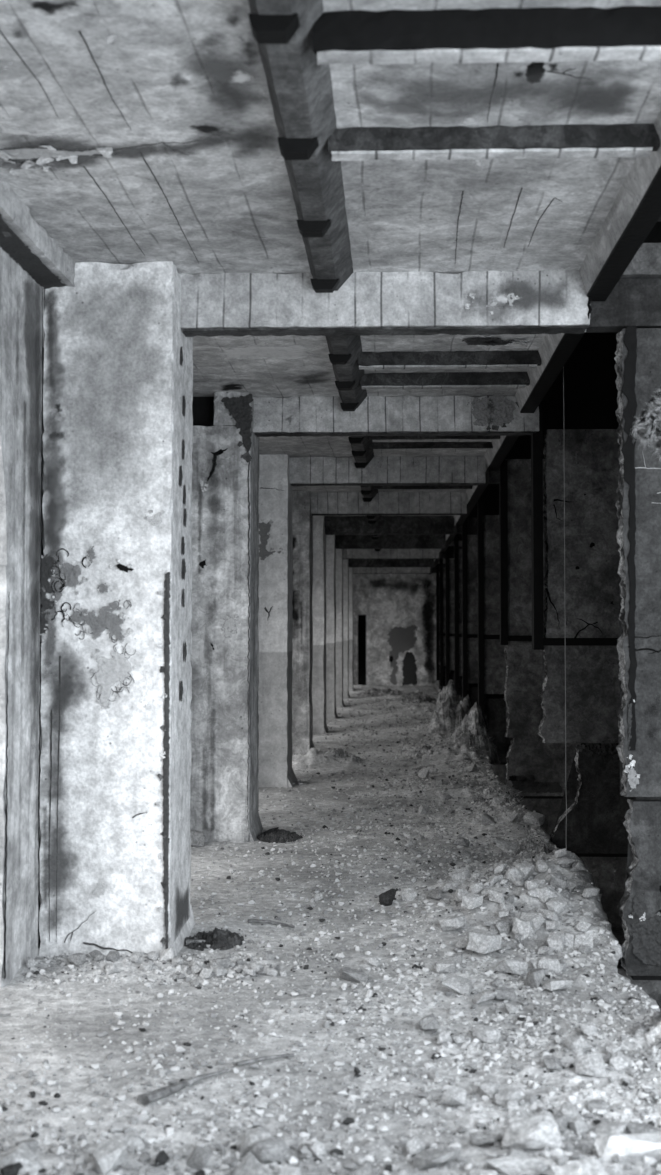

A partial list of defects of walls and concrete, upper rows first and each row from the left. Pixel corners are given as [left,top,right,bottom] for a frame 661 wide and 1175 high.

damp [364,64,633,122]
peeling [0,145,113,175]
spalling [183,394,253,463]
peeling [40,546,137,709]
peeling [387,625,418,685]
crack [545,588,603,639]
crack [628,635,661,653]
spalling [156,440,187,949]
spalling [629,893,648,921]